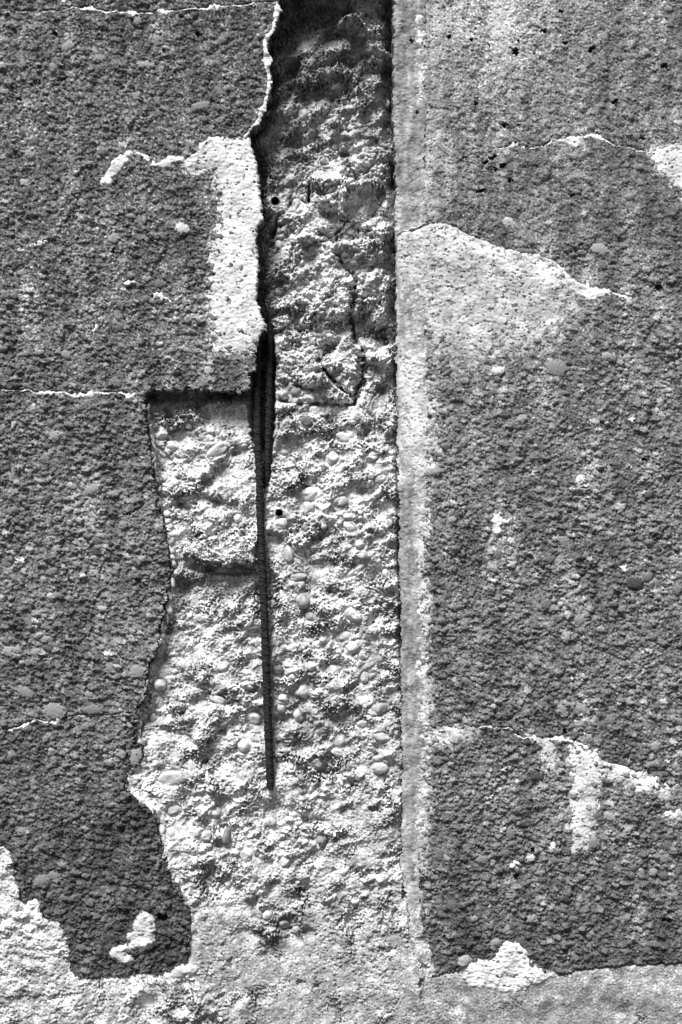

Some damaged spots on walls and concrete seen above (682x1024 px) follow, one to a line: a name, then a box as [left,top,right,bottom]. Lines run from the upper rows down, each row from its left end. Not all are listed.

crack [11,1,275,16]
crack [491,133,682,153]
crack [0,388,144,398]
spalling [124,0,428,976]
crack [8,712,135,732]